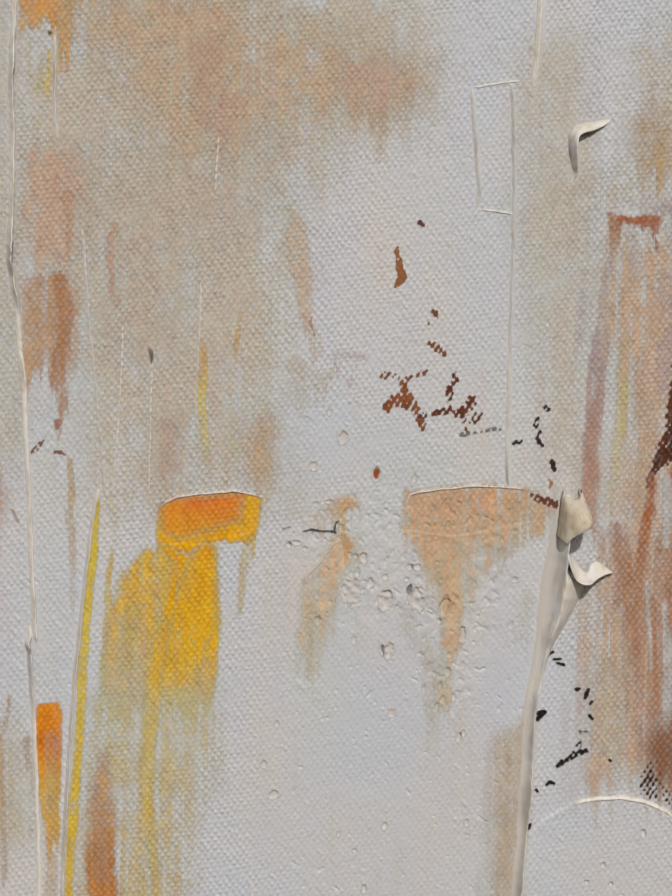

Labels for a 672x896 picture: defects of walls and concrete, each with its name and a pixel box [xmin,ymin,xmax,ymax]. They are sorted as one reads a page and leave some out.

peeling [568,120,610,182]
corrosion [609,213,662,259]
corrosion [613,381,672,715]
corrosion [648,727,672,788]